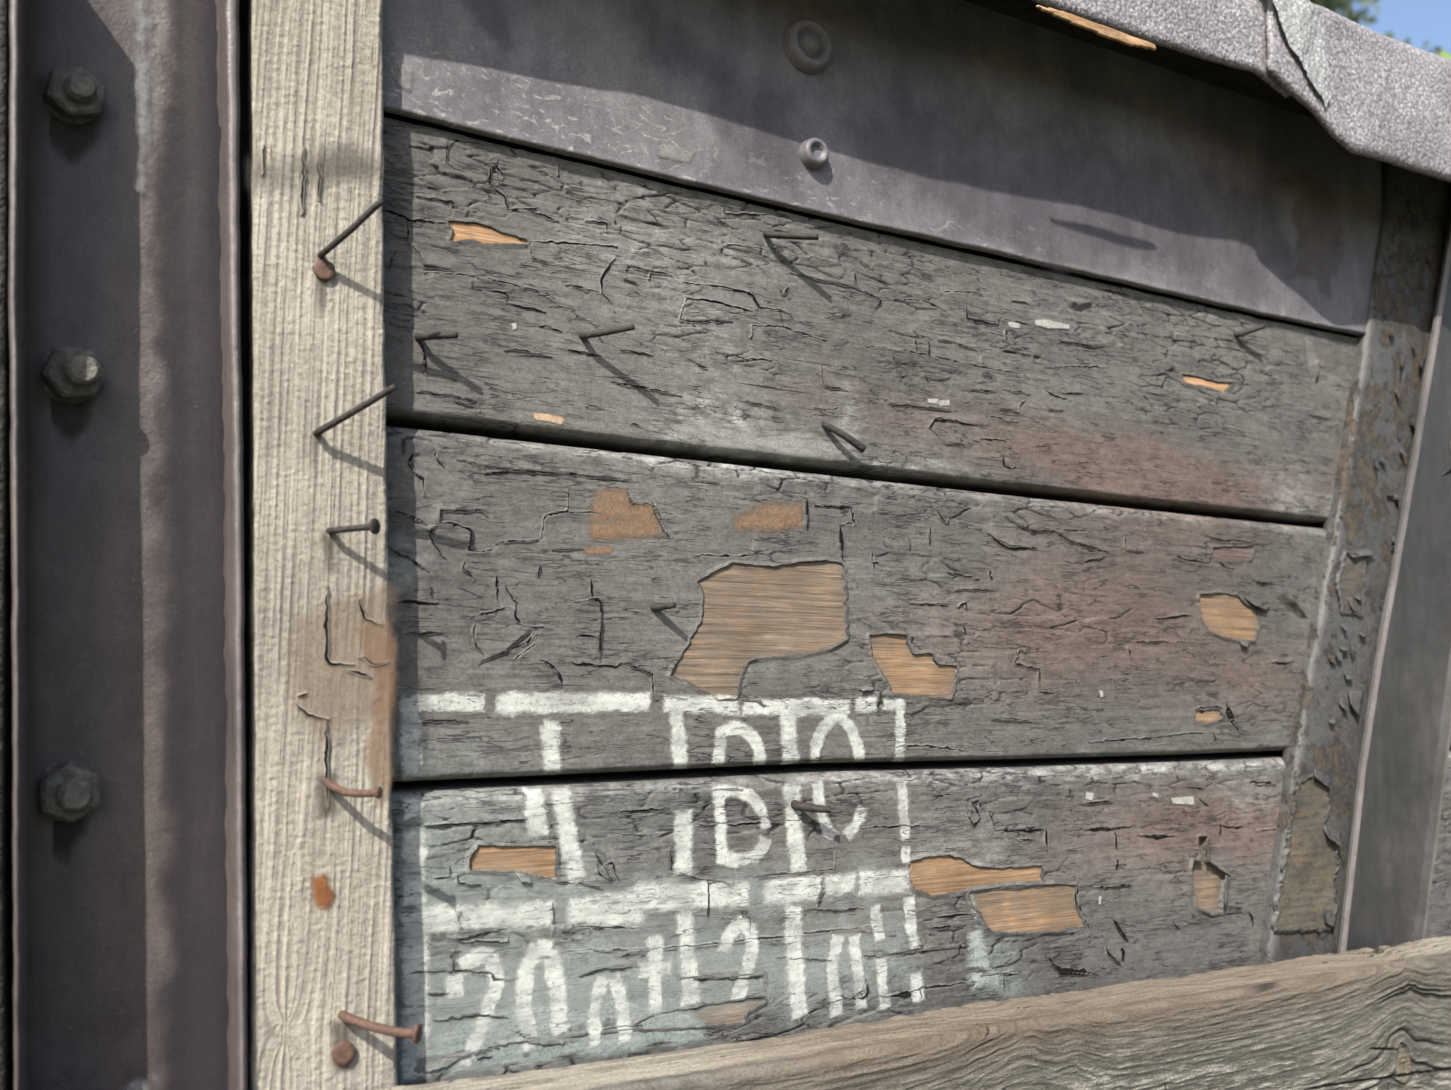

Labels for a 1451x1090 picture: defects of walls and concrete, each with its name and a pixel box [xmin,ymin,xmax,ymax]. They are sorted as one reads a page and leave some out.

peeling [443,216,531,249]
crack [382,139,1154,470]
crack [294,448,755,808]
peeling [666,556,960,702]
crack [910,508,1274,633]
peeling [1196,589,1270,647]
rust [312,875,334,909]
crack [424,817,527,827]
peeling [464,840,561,885]
crack [549,793,1175,1000]
peeling [904,851,1087,937]
crack [407,865,642,1073]